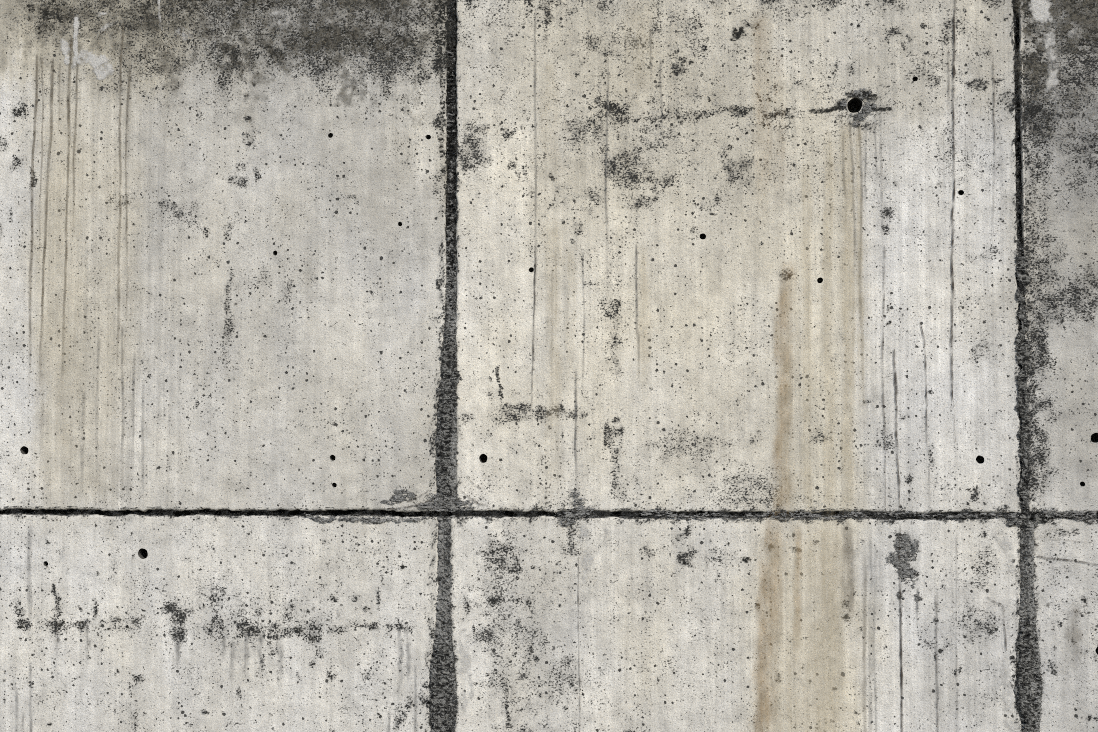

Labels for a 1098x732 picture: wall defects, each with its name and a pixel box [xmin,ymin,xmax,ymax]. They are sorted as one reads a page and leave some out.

leakage [0,132,38,223]
leakage [12,0,559,497]